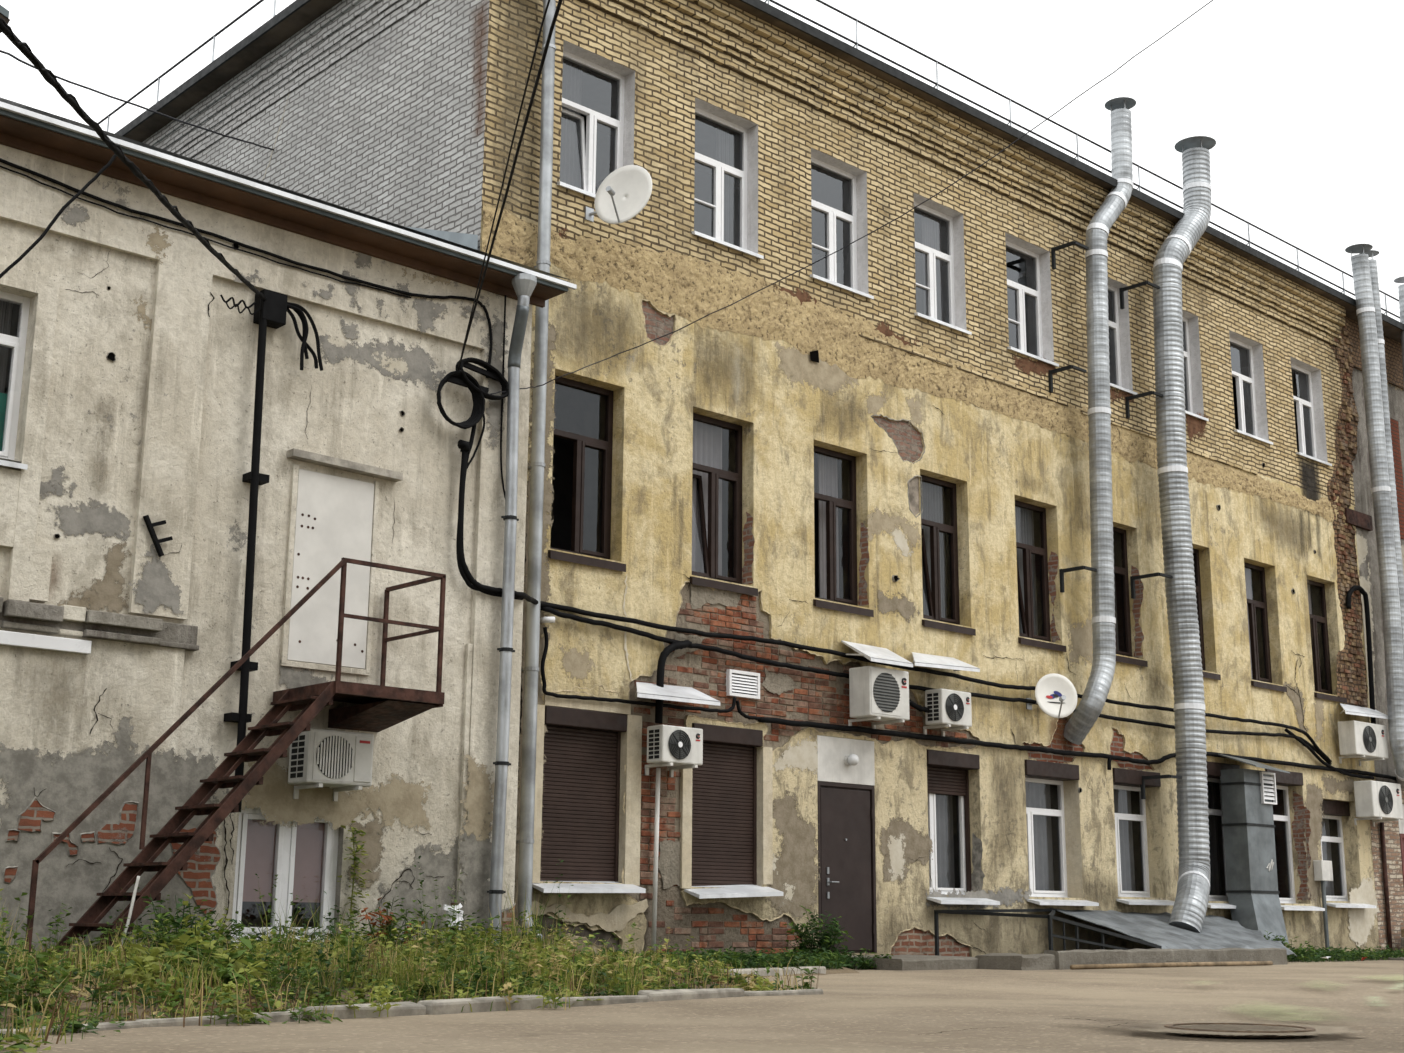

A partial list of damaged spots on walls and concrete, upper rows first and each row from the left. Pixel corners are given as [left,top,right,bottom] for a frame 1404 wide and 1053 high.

peeling [302,252,454,392]
spalling [482,202,1089,623]
spalling [1111,424,1158,470]
peeling [40,466,184,616]
spalling [1186,321,1377,741]
flaking render [501,321,980,957]
flaking render [2,866,18,884]
flaking render [5,797,139,857]
flaking render [171,827,221,916]